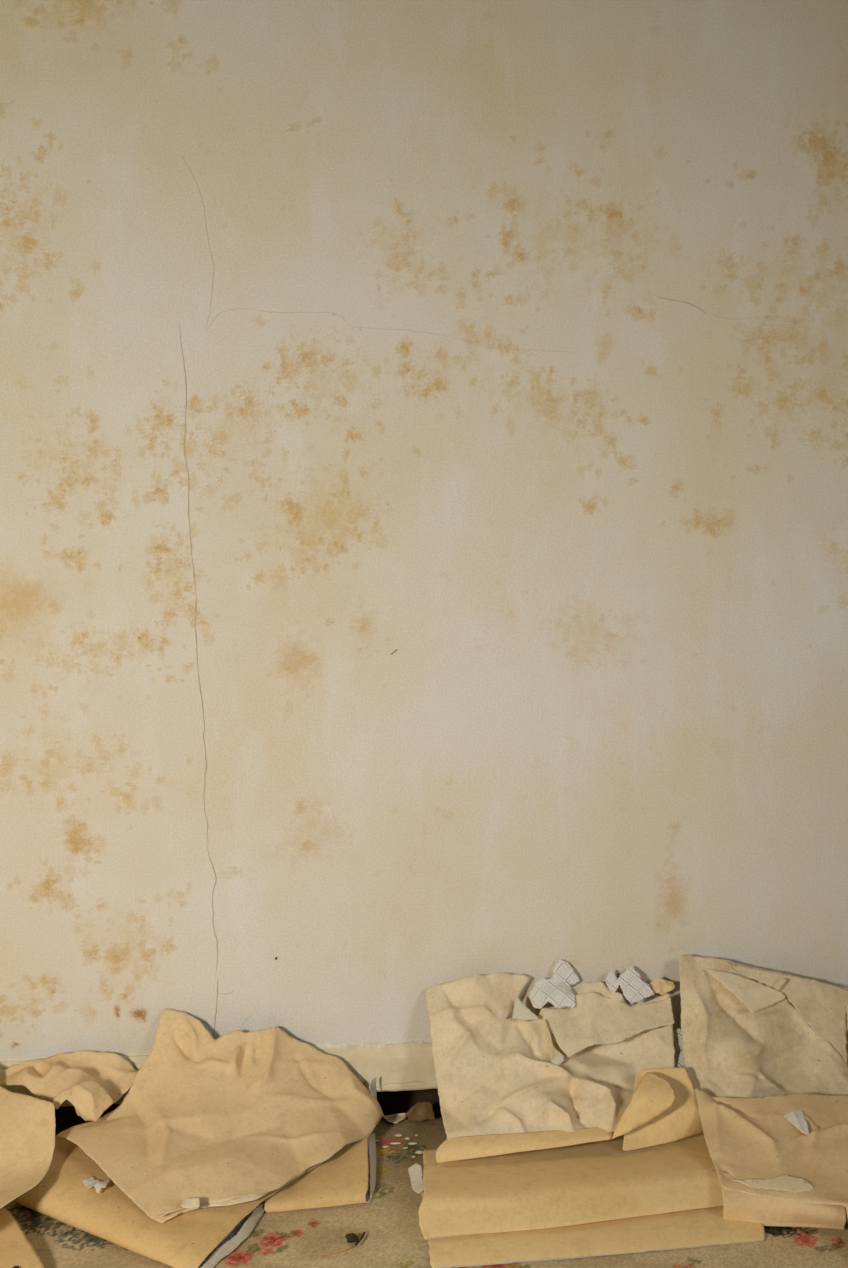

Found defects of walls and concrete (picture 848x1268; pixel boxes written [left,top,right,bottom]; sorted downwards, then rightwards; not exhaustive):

crack [179,155,565,1037]